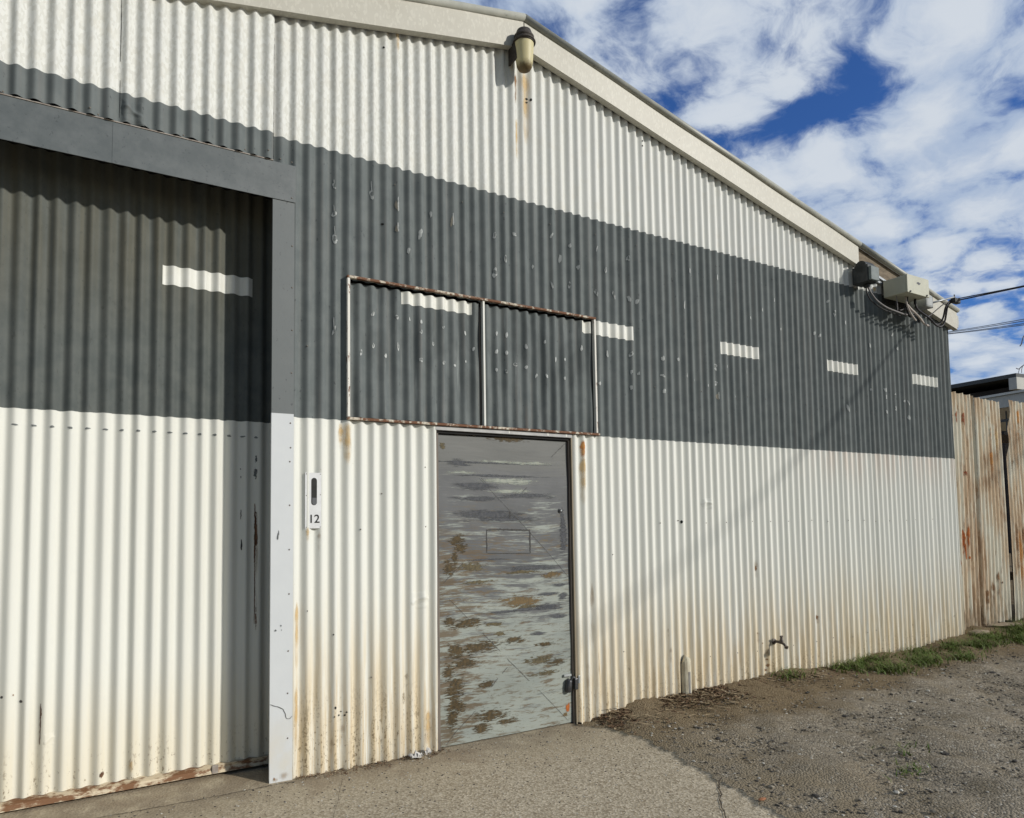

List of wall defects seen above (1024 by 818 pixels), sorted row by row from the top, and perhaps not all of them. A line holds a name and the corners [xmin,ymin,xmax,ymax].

rust [443,534,493,585]
rust [962,528,971,559]
rust [498,595,542,609]
rust [442,616,565,734]